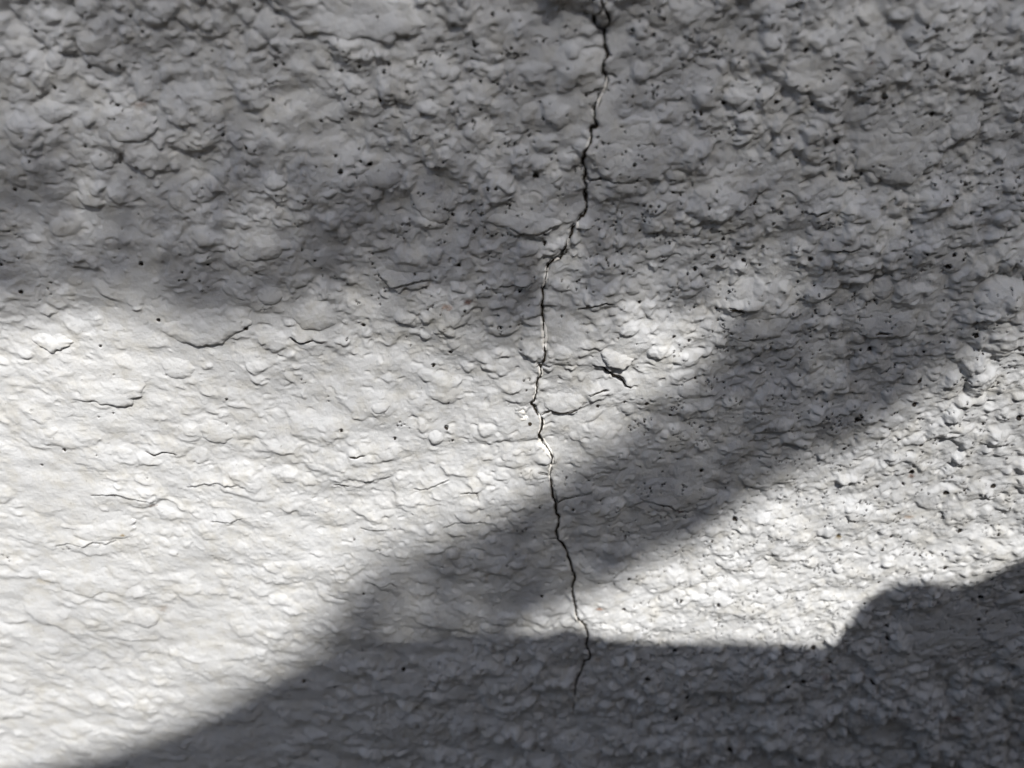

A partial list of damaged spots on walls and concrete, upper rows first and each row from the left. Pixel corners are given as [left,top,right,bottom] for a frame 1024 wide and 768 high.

crack [509,0,638,722]